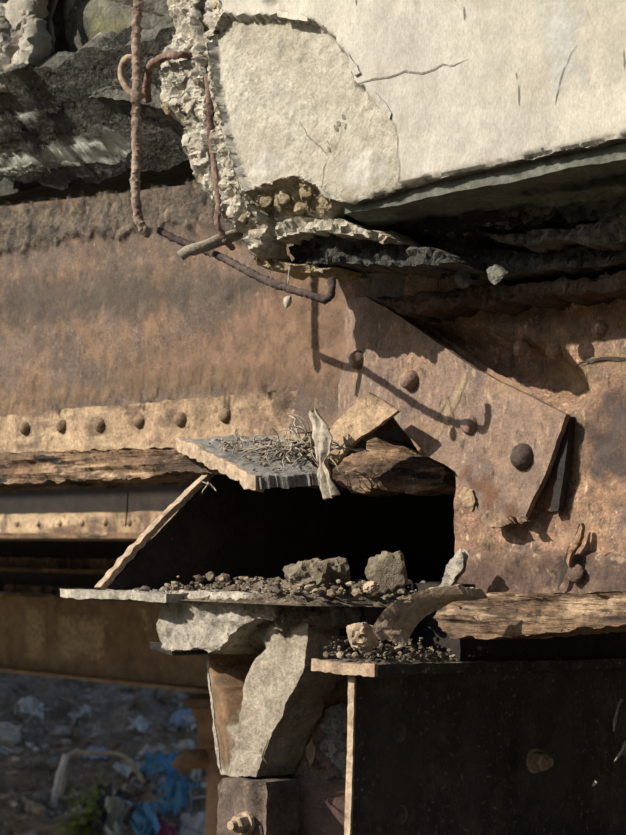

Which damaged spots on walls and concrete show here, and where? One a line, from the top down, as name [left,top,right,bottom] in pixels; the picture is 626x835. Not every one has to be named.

spalling [0,0,12,58]
crack [353,59,468,88]
crack [555,45,577,103]
peeling [118,0,626,305]
corrosion [2,273,370,414]
crack [576,356,626,368]
corrosion [432,369,469,441]
spalling [256,597,373,633]
peeling [208,674,220,769]
peeling [305,703,348,779]